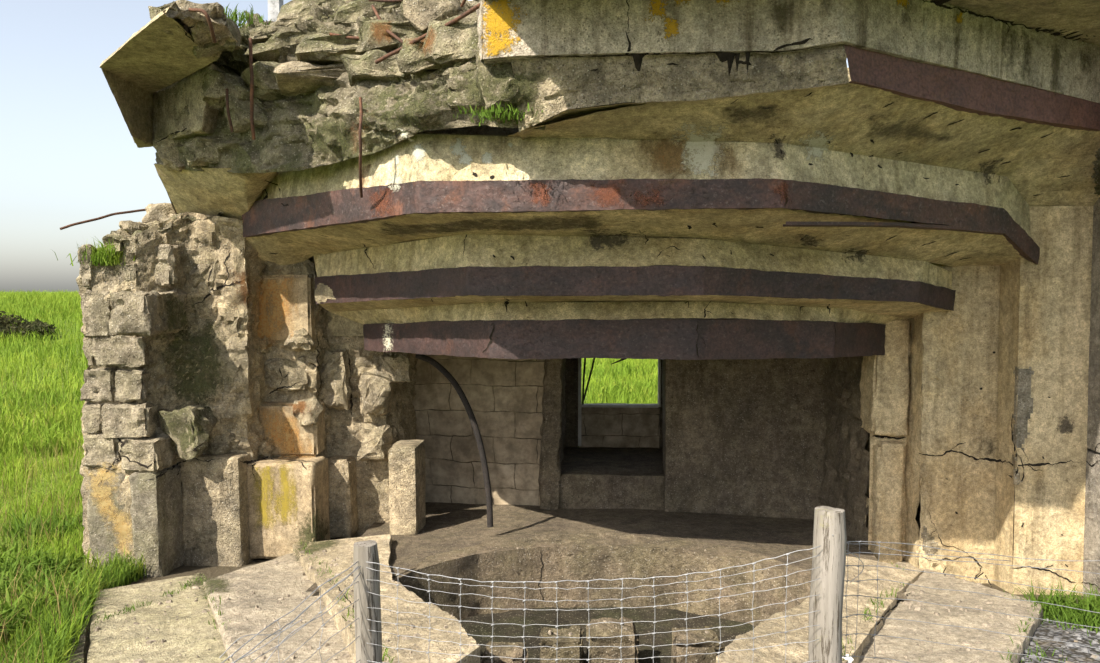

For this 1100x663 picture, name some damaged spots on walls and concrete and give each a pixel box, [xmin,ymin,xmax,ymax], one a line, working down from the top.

spalling [368,0,427,64]
spalling [444,0,480,26]
crack [923,0,1095,42]
crack [873,415,1100,485]
crack [922,511,1098,588]